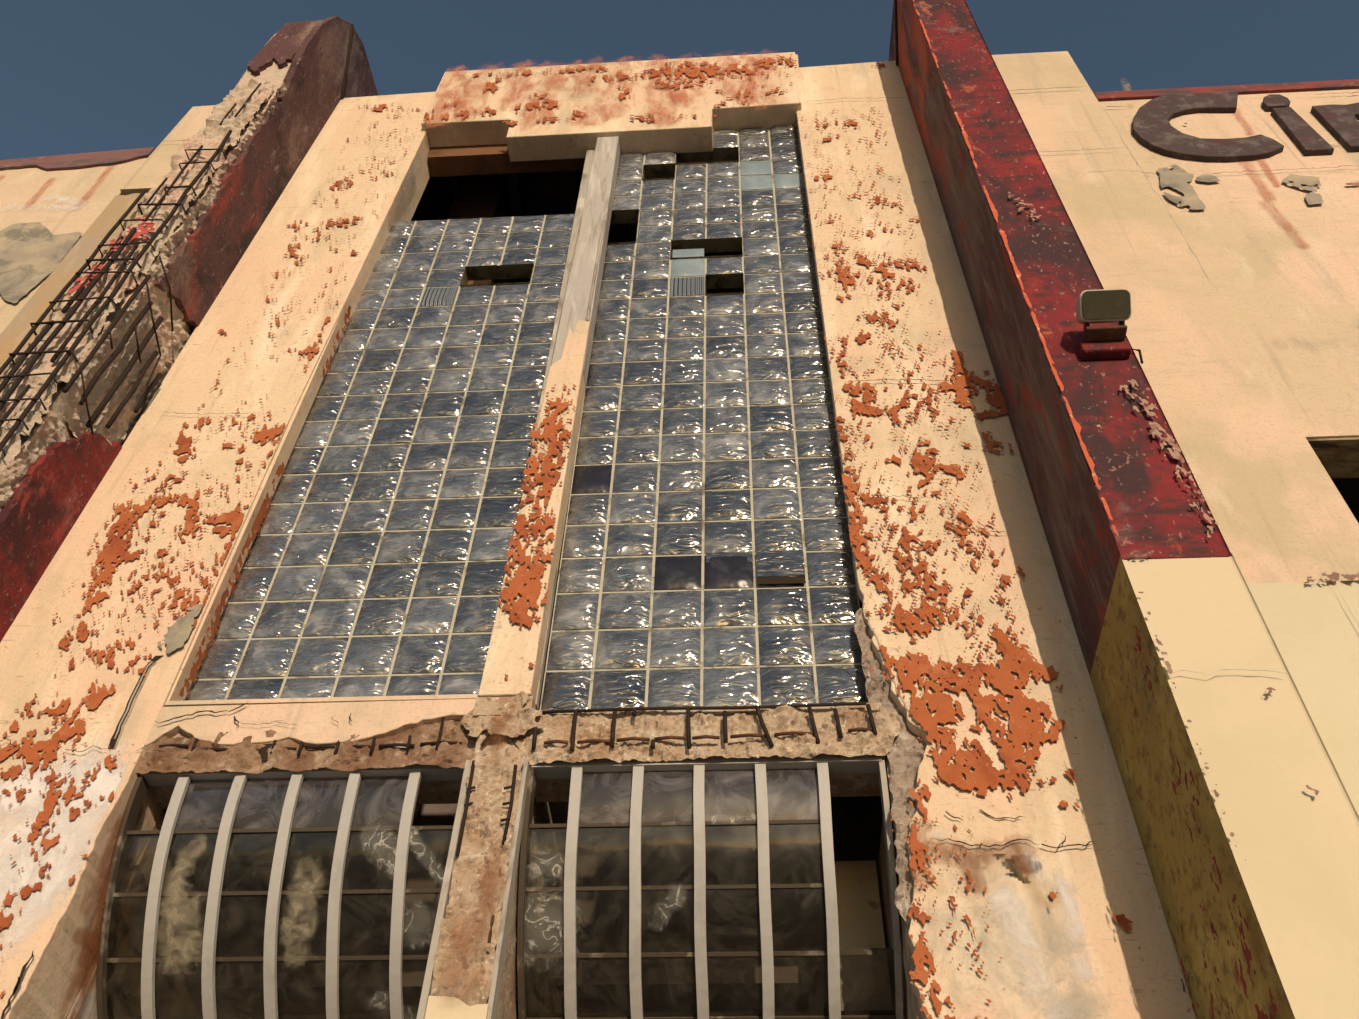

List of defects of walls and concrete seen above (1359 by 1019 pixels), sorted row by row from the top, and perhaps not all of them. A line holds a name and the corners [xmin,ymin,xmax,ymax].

spalling [1157,165,1221,210]
peeling [913,0,1119,537]
spalling [0,54,1077,1019]
crack [65,655,295,752]
leakage [0,748,126,955]
crack [936,809,1098,849]
peeling [1113,913,1133,931]